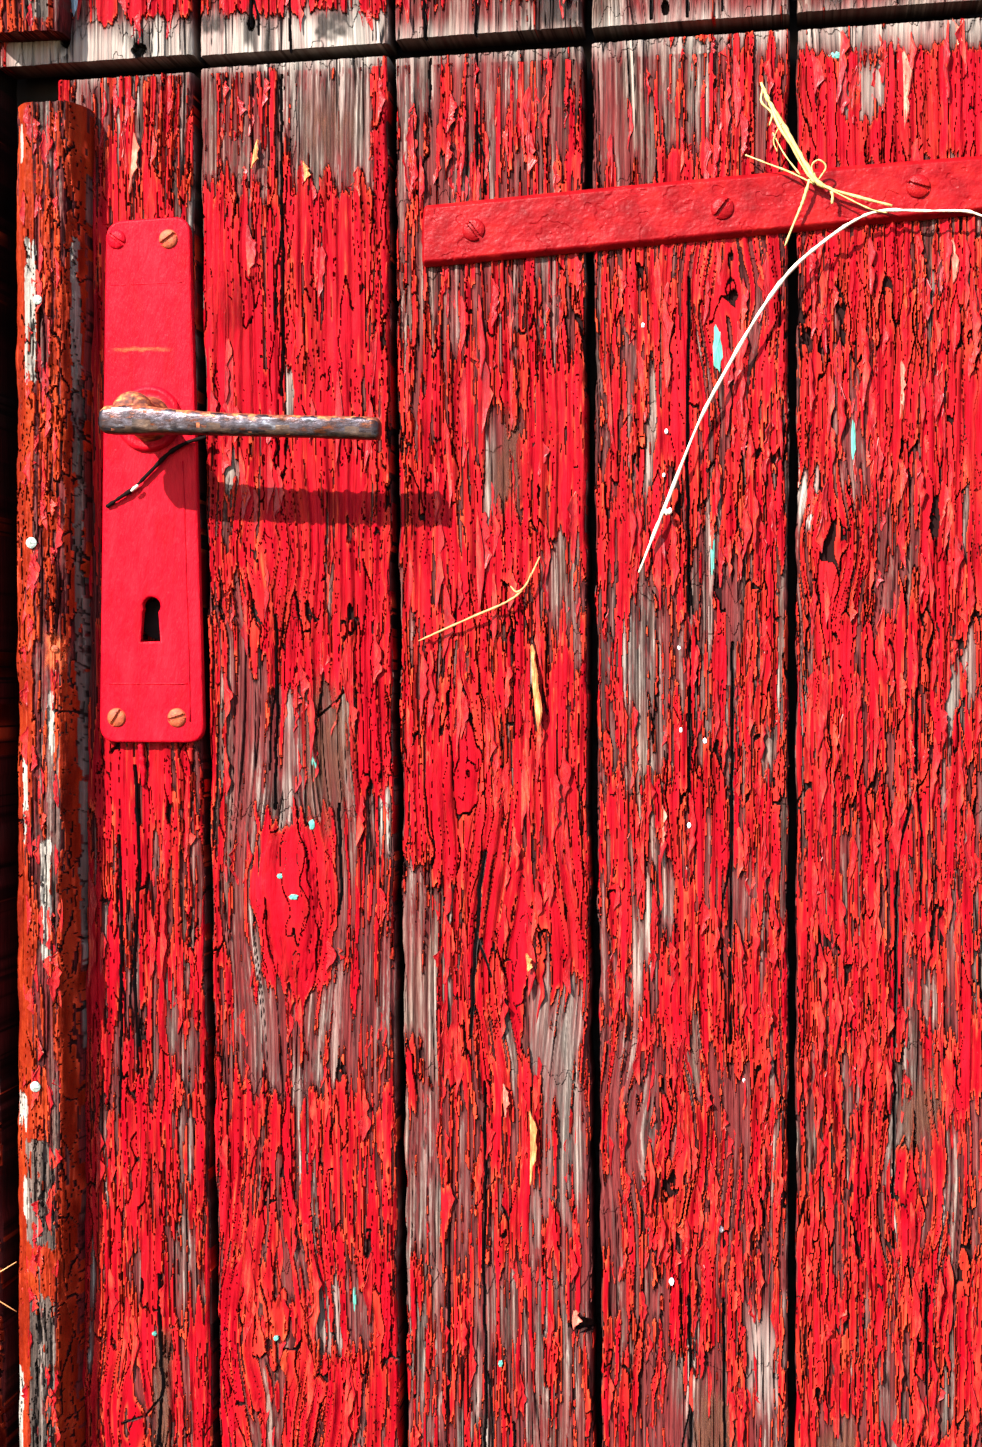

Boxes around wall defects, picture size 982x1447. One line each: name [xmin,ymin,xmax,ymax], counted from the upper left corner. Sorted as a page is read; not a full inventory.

peeling [0,0,982,415]
peeling [20,242,64,663]
peeling [20,681,29,707]
peeling [51,660,59,711]
peeling [20,726,59,876]
peeling [86,227,982,1447]
peeling [23,894,63,1015]
peeling [22,1038,61,1115]
peeling [22,1147,63,1359]
peeling [45,1366,61,1447]